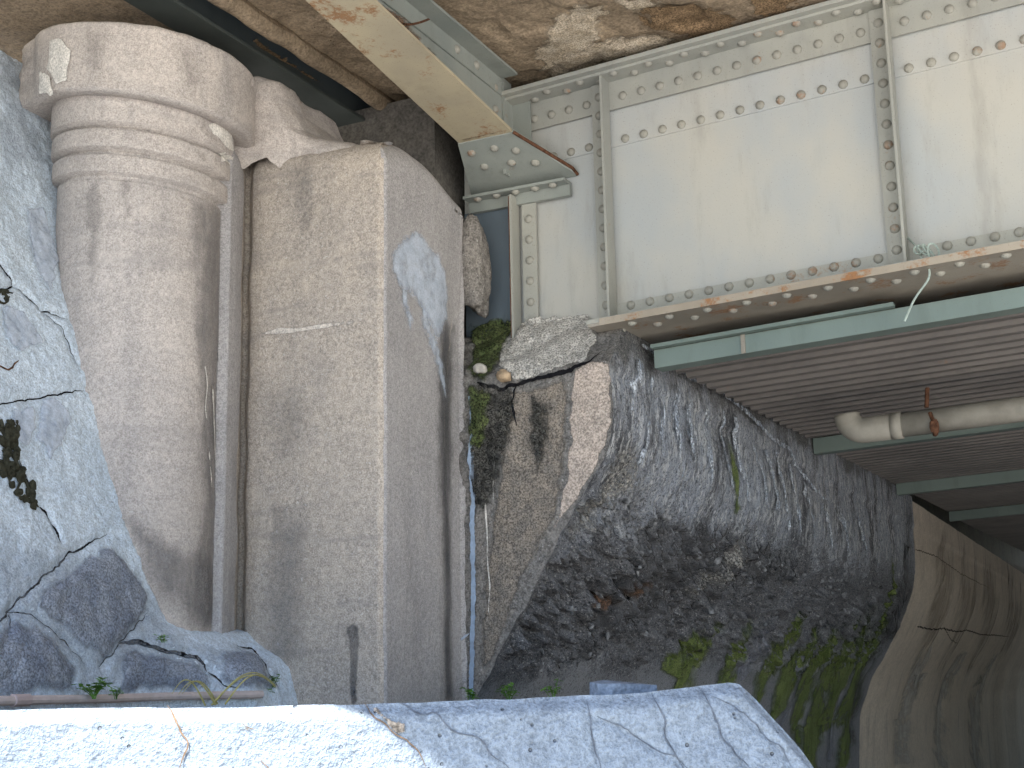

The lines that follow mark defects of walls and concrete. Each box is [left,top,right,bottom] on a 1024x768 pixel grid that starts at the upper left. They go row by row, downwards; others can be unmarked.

spalling [39,38,70,96]
rust [512,131,579,176]
crack [0,265,77,364]
rust [599,240,1024,326]
crack [0,390,81,405]
water stain [393,233,451,593]
crack [477,353,599,426]
crack [0,507,106,654]
crack [917,626,1008,643]